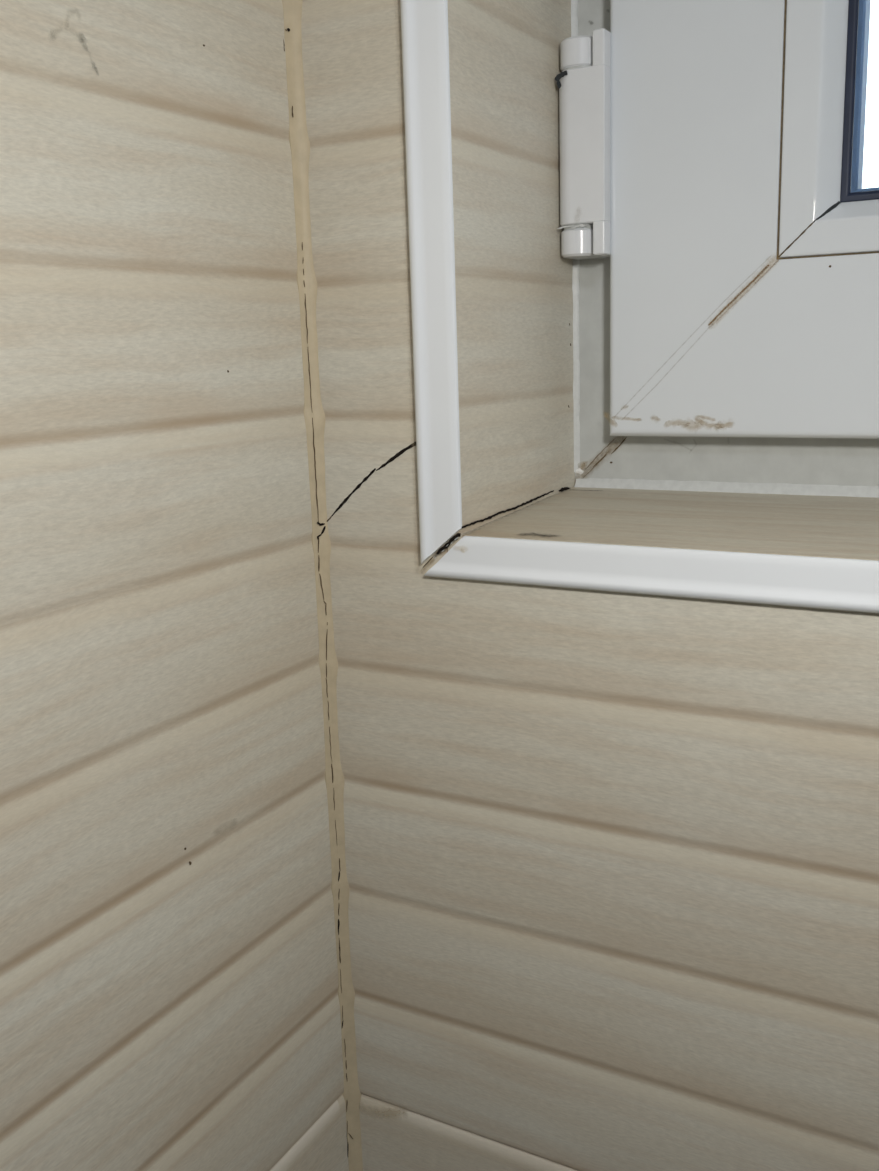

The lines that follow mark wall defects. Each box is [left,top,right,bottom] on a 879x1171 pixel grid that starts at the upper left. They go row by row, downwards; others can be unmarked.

crack [462,487,599,531]